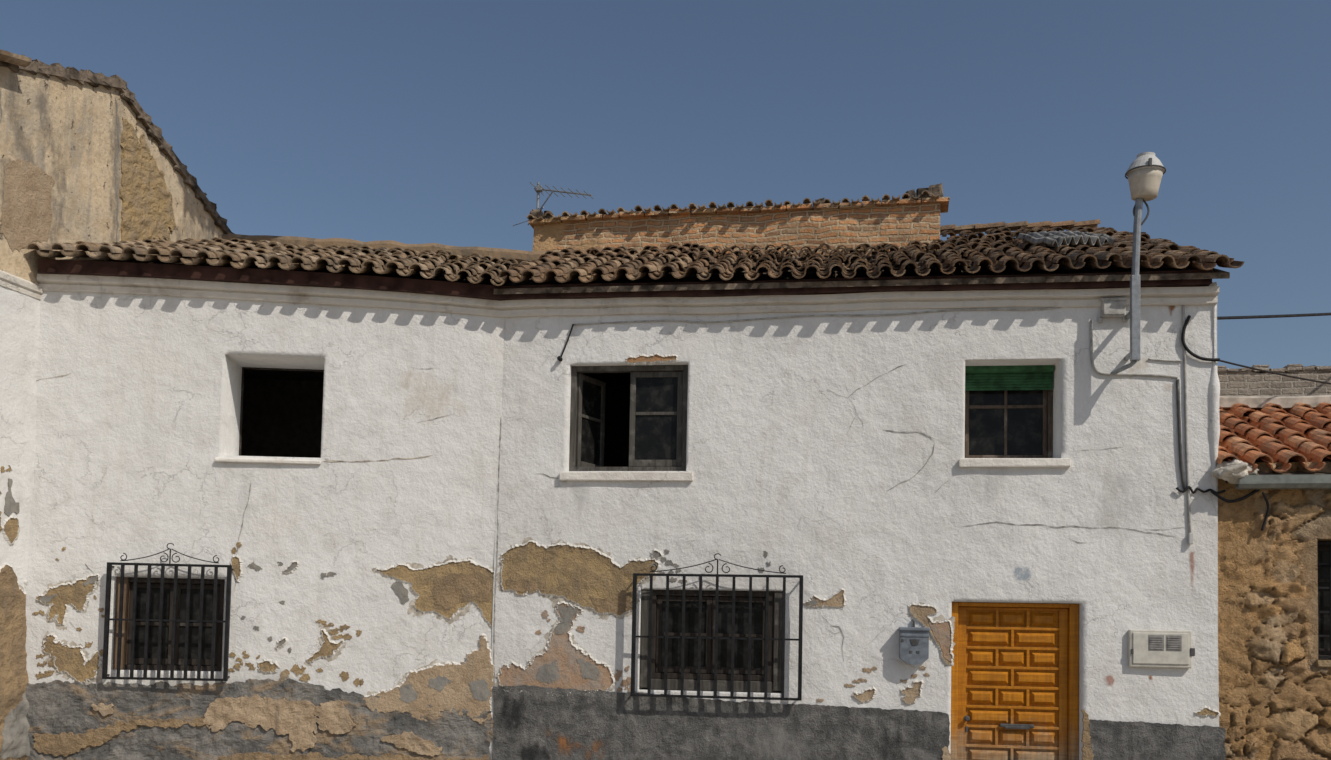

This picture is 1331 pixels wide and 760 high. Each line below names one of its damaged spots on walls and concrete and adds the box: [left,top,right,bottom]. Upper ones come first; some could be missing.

crack [827,364,953,490]
flaking render [0,465,20,546]
crack [961,521,1183,543]
flaking render [0,537,687,760]
flaking render [907,602,955,666]
flaking render [844,666,877,704]
flaking render [899,666,930,706]